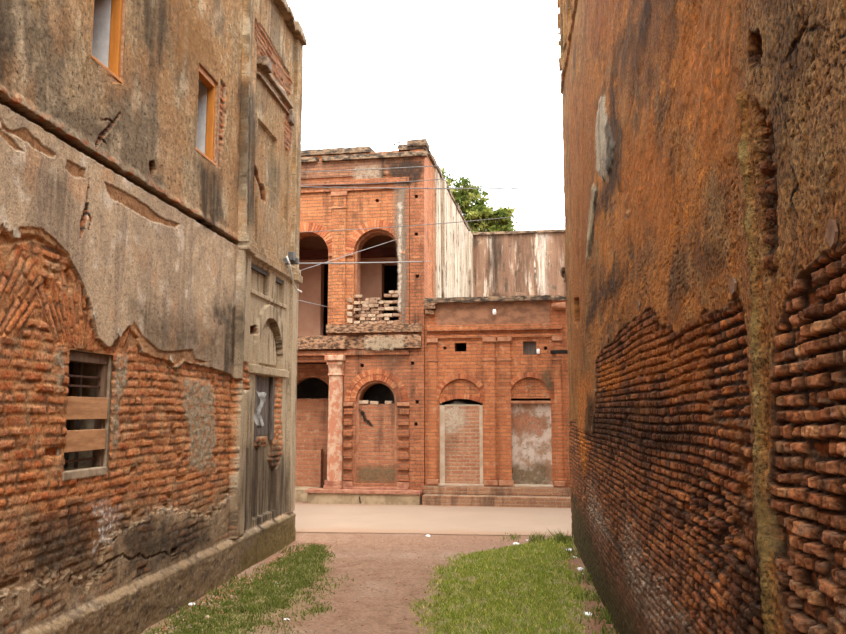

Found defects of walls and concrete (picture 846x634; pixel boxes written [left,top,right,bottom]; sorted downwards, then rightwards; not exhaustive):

peeling [0,115,58,159]
peeling [65,159,87,181]
crack [95,111,121,148]
peeling [103,180,180,230]
damp [197,170,215,228]
damp [587,73,622,254]
damp [489,235,501,282]
damp [513,234,531,292]
spalling [0,220,250,612]
damp [512,463,547,484]
spalling [569,278,766,634]
spalling [769,220,846,634]